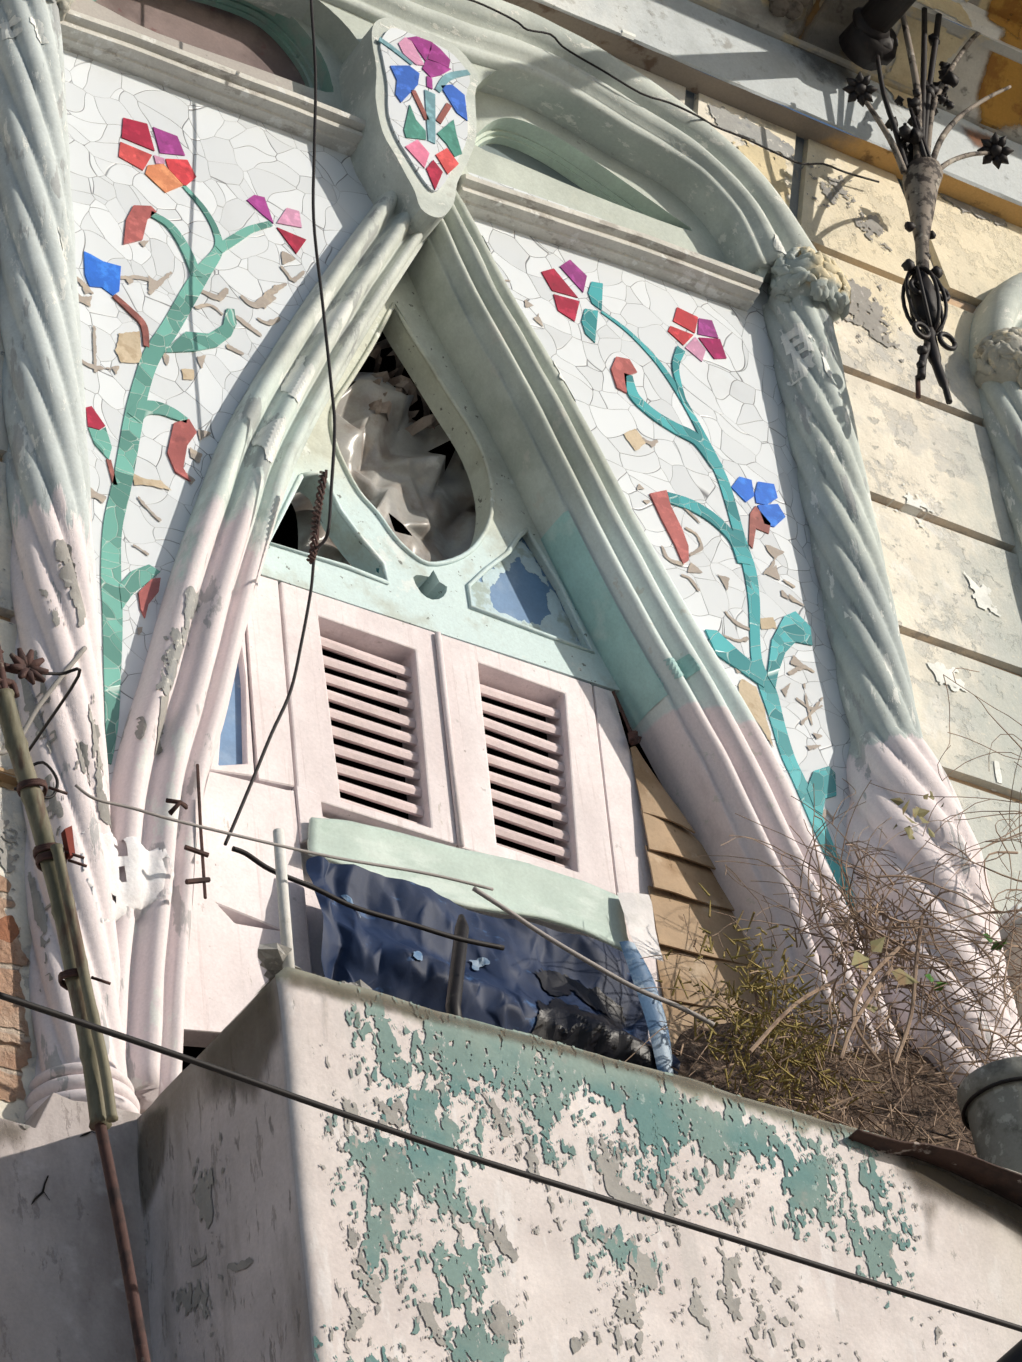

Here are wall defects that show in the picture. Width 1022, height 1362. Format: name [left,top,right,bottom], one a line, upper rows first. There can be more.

peeling [779,323,832,386]
peeling [133,474,171,521]
peeling [886,474,942,528]
peeling [39,539,86,627]
peeling [964,572,1001,617]
peeling [21,650,57,753]
peeling [135,586,199,755]
peeling [927,660,968,692]
peeling [75,693,112,828]
peeling [45,774,66,836]
flaking render [0,816,53,1102]
peeling [313,982,922,1362]